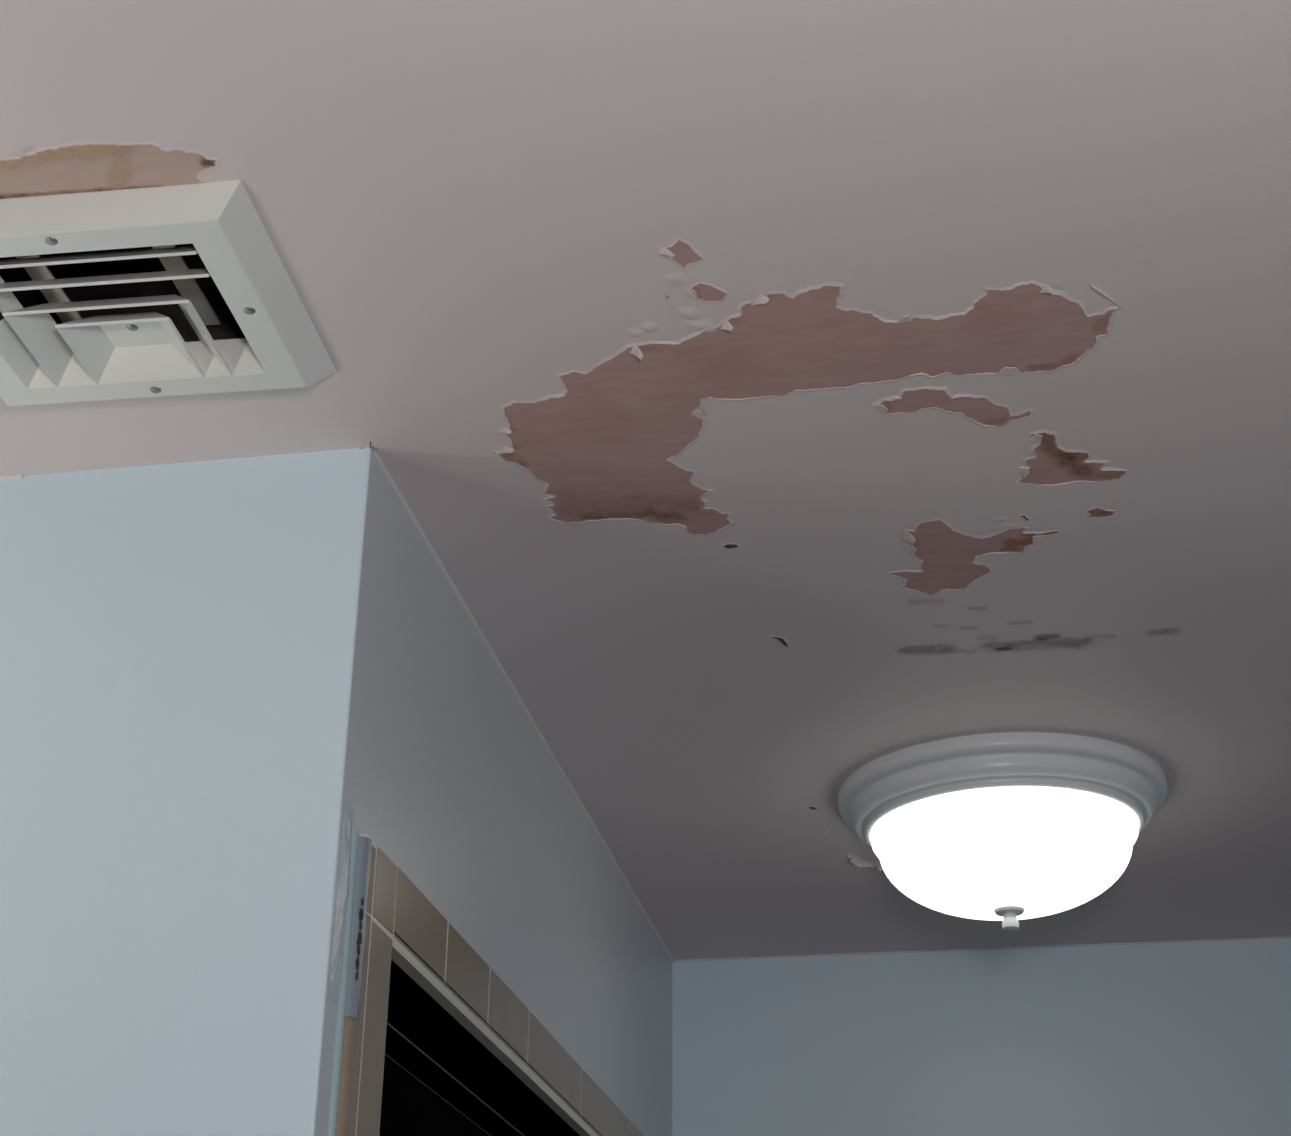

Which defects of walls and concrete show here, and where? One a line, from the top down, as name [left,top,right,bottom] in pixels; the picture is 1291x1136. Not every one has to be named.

peeling [0,138,222,199]
peeling [658,237,707,269]
peeling [493,280,1129,550]
peeling [885,514,1063,597]